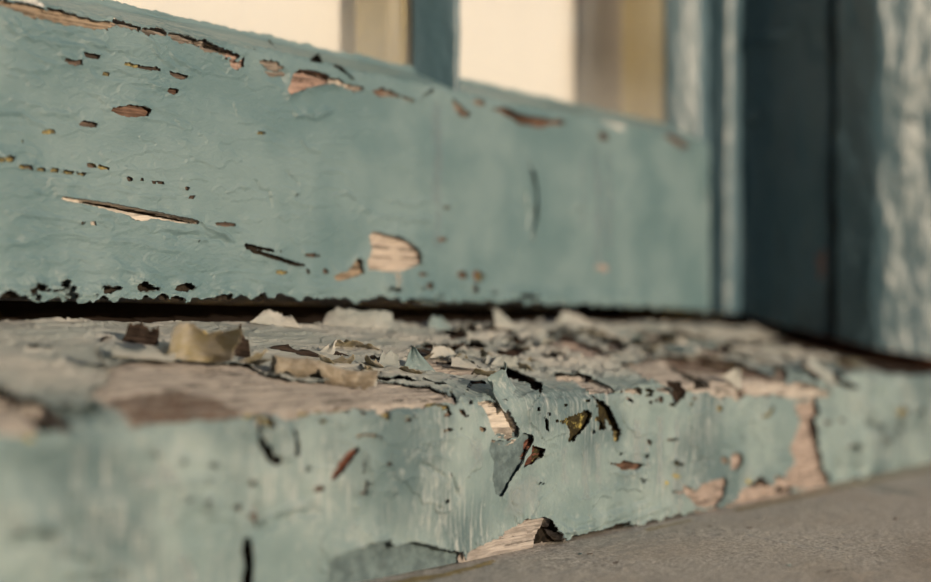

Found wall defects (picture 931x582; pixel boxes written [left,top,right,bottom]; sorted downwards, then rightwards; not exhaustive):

peeling [0,0,574,140]
peeling [0,145,255,249]
peeling [0,272,202,303]
peeling [73,221,895,582]